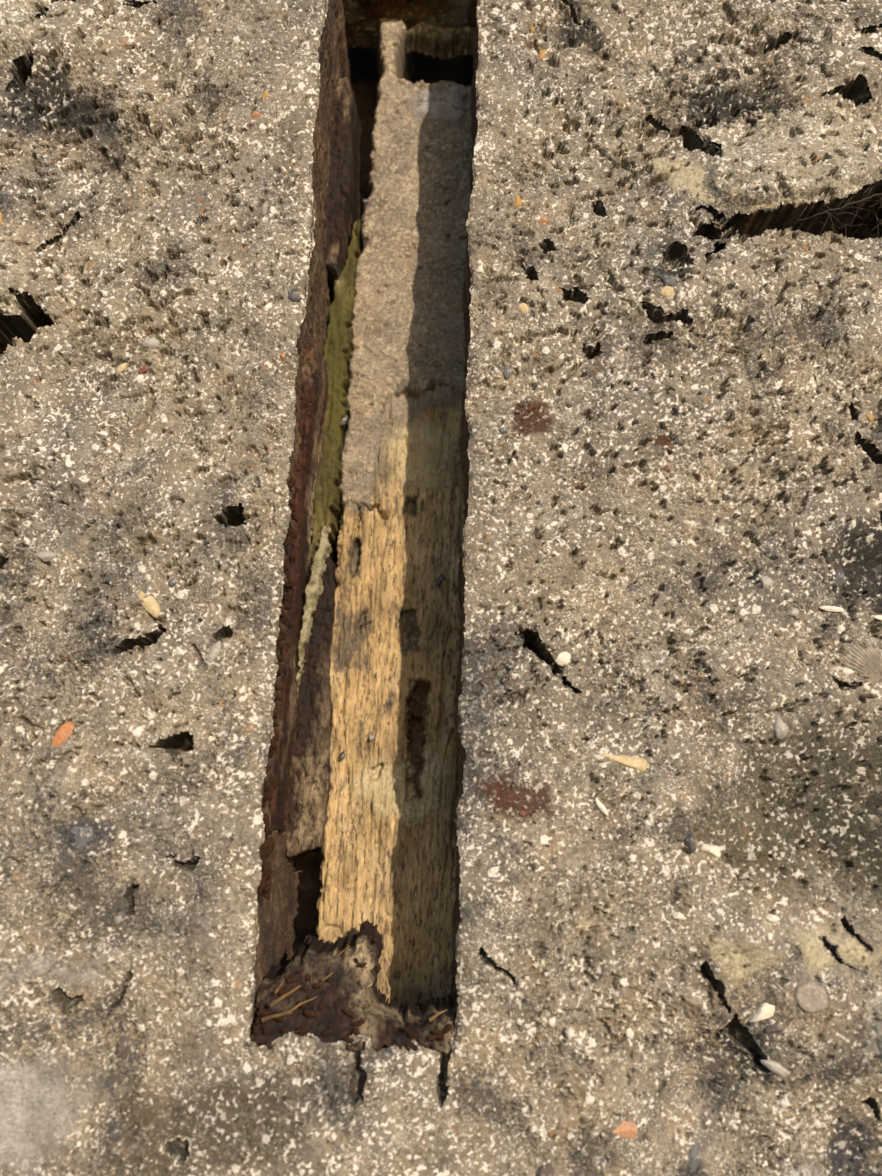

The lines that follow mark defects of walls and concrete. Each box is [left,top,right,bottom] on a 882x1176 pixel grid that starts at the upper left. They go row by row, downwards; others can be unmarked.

rust [357,0,446,29]
spalling [0,291,55,357]
crack [695,960,772,1073]